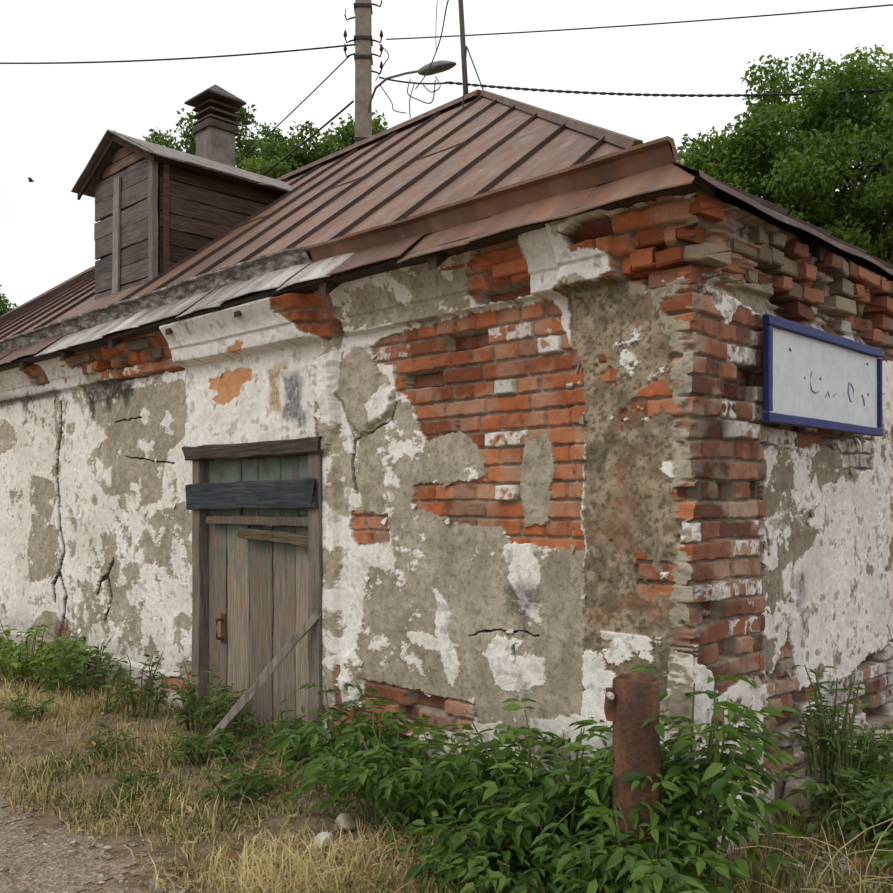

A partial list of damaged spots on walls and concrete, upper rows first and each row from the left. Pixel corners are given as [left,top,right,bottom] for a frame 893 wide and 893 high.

crack [50,400,68,638]
crack [95,557,114,622]
peeling [19,331,192,695]
peeling [208,367,252,405]
peeling [225,339,243,354]
peeling [331,239,588,739]
crack [468,628,540,658]
spalling [556,173,893,780]